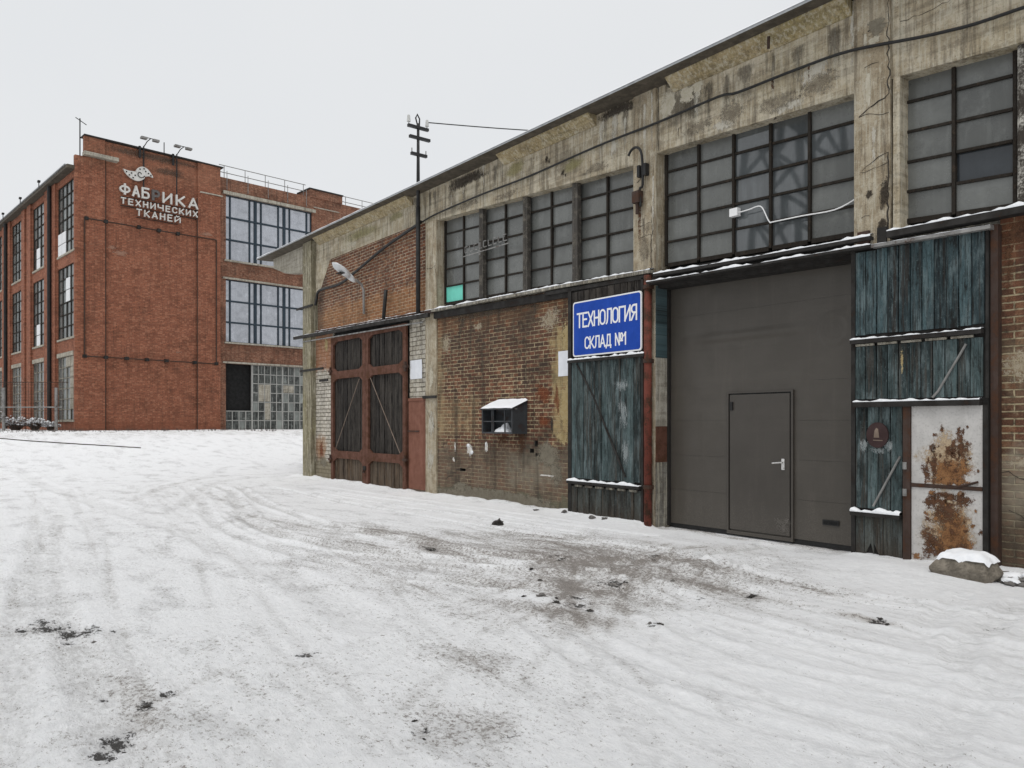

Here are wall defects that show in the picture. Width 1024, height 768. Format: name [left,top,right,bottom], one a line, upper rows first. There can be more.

peeling [659,80,744,135]
spalling [760,69,837,120]
crack [859,0,950,118]
corrosion [912,424,982,560]